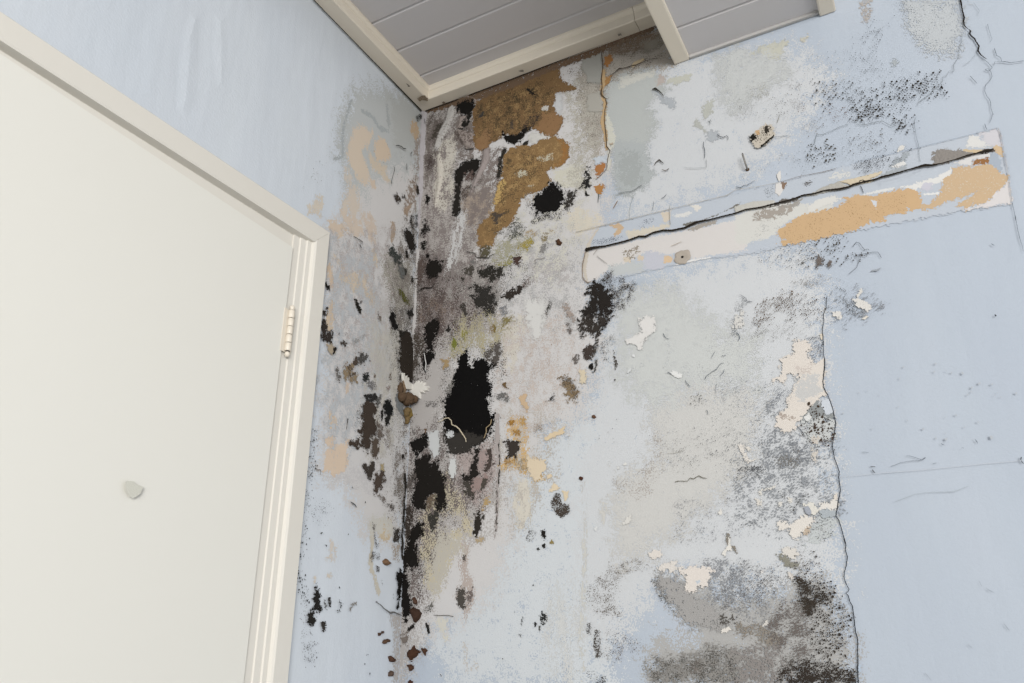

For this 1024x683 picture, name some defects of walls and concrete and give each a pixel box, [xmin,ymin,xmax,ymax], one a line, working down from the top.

flaking render [472,69,577,248]
crack [314,0,1023,283]
peeling [672,128,1014,232]
water stain [297,0,973,683]
flaking render [799,399,838,448]
crack [822,297,859,683]